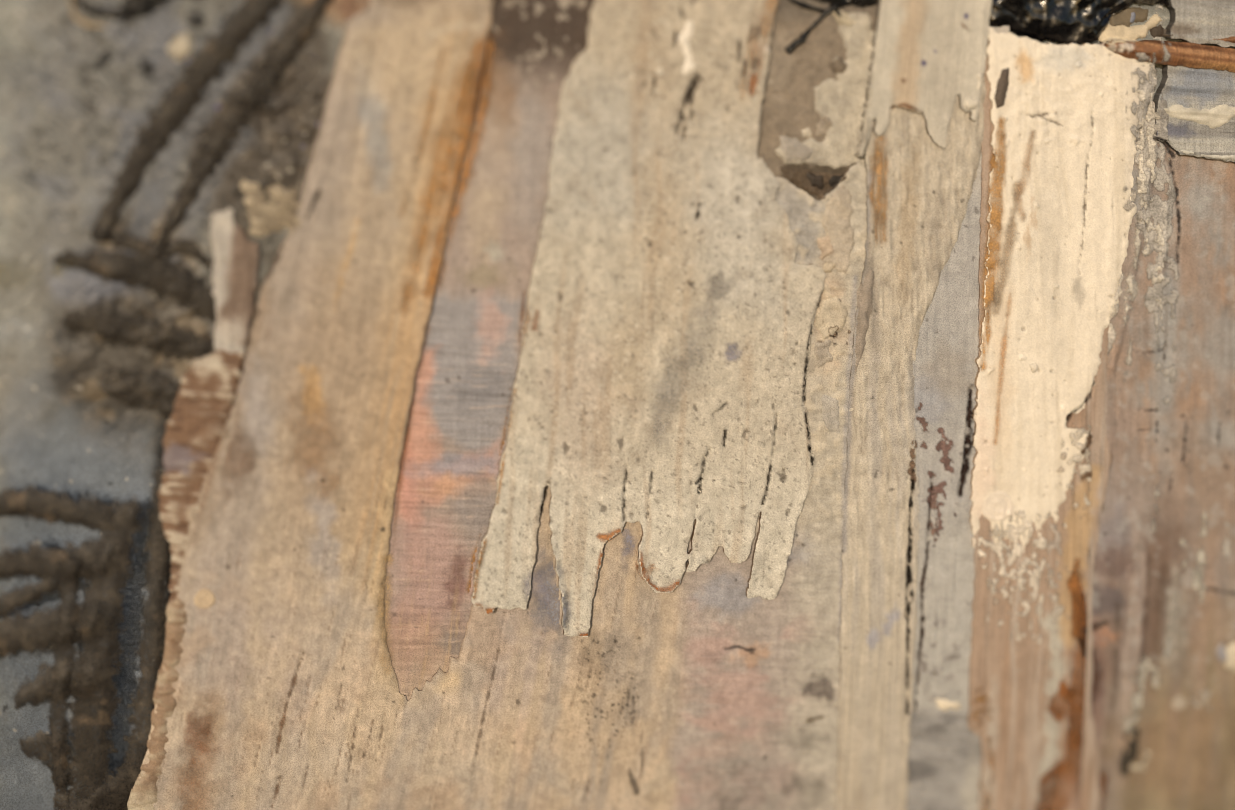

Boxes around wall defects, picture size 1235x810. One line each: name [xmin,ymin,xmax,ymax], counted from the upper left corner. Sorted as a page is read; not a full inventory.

peeling [677,20,695,74]
crack [762,466,772,504]
crack [774,299,820,465]
peeling [775,10,876,273]
peeling [814,296,851,369]
rust [982,118,1021,380]
peeling [1098,5,1235,383]
rust [1037,560,1108,810]